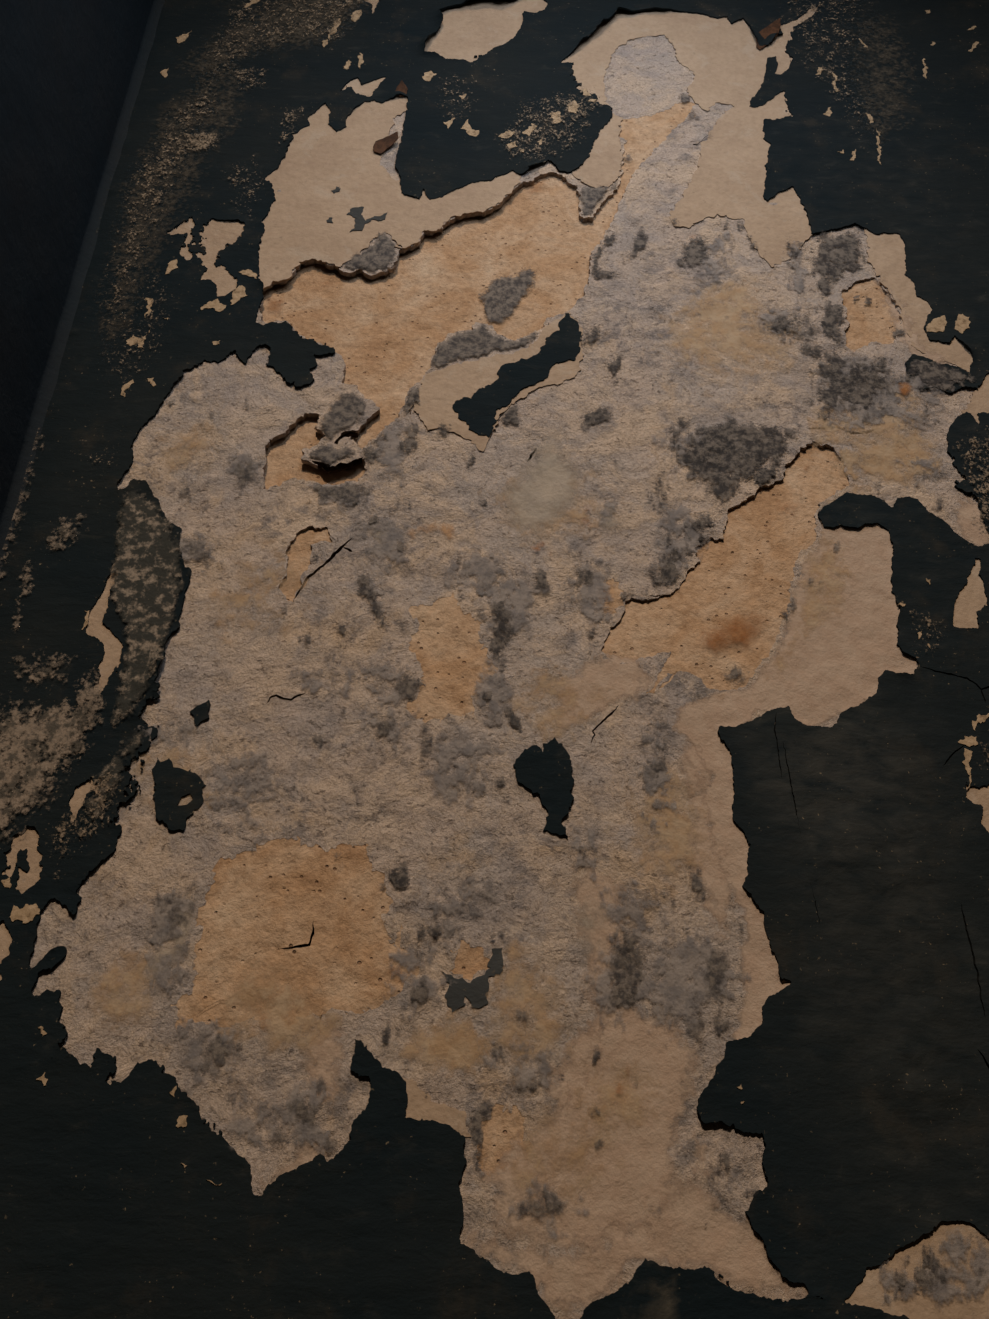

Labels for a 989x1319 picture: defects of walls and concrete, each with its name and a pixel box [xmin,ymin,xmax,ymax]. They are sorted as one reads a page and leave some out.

peeling [424,0,547,62]
peeling [165,218,248,312]
flaking render [256,100,694,449]
peeling [82,564,123,694]
water stain [309,388,420,628]
water stain [338,545,550,809]
flaking render [601,444,849,694]
water stain [568,219,974,643]
peeling [953,559,987,628]
peeling [1,826,43,894]
flaking render [171,836,420,1029]
peeling [844,1221,989,1319]